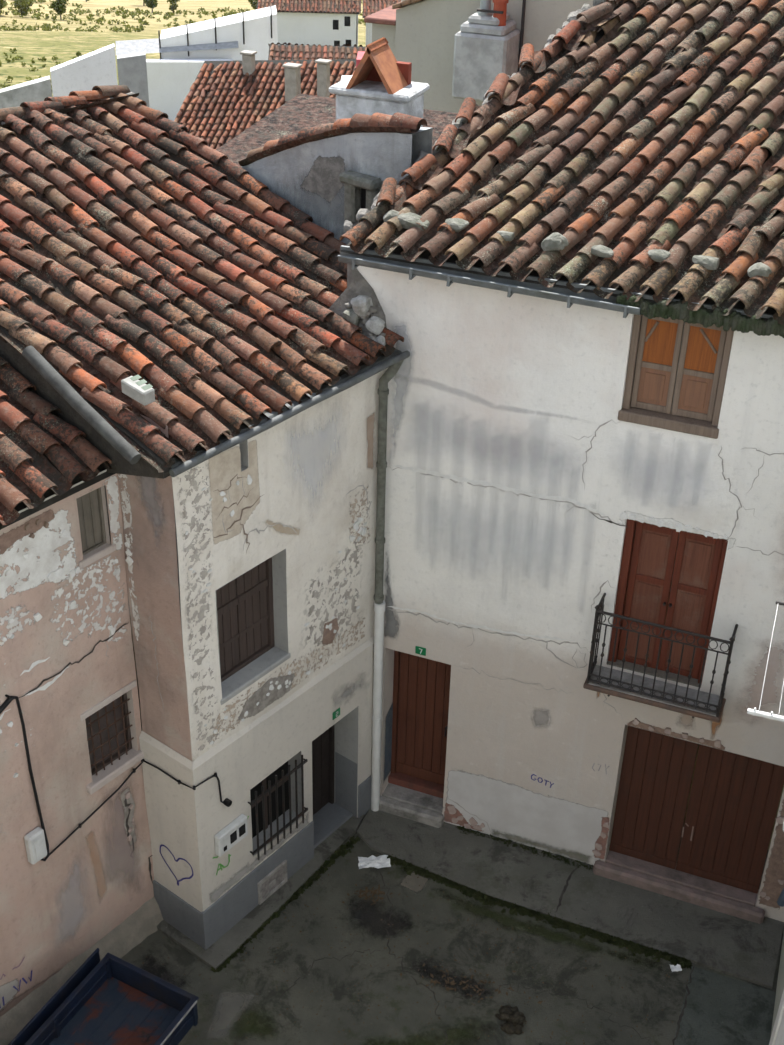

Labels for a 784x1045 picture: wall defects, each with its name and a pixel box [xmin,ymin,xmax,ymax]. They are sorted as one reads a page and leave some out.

crack [214,495,296,553]
crack [390,420,627,527]
crack [718,447,784,556]
peeling [0,474,140,689]
spalling [180,440,372,750]
crack [19,622,129,698]
crack [387,606,587,694]
spalling [444,798,491,832]